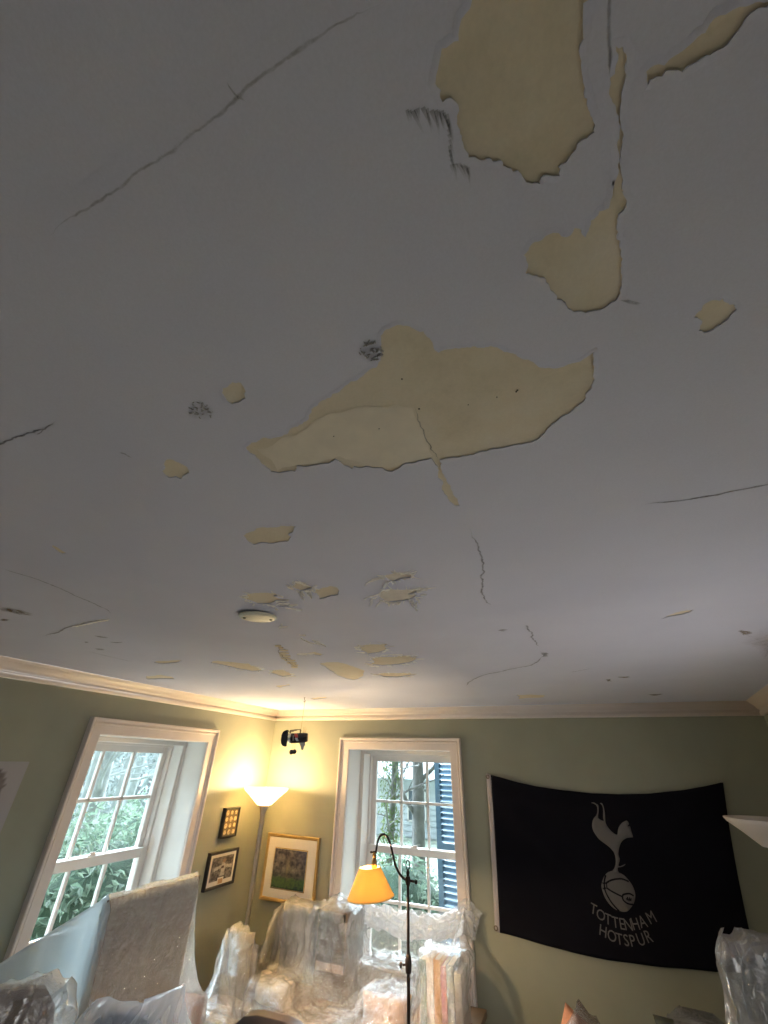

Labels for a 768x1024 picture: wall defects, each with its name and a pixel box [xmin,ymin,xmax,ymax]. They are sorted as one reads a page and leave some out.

peeling [428,0,768,317]
peeling [689,294,742,337]
peeling [242,320,599,507]
crack [640,485,768,509]
peeling [241,524,298,546]
peeling [239,579,341,611]
peeling [364,570,436,612]
peeling [319,642,420,680]